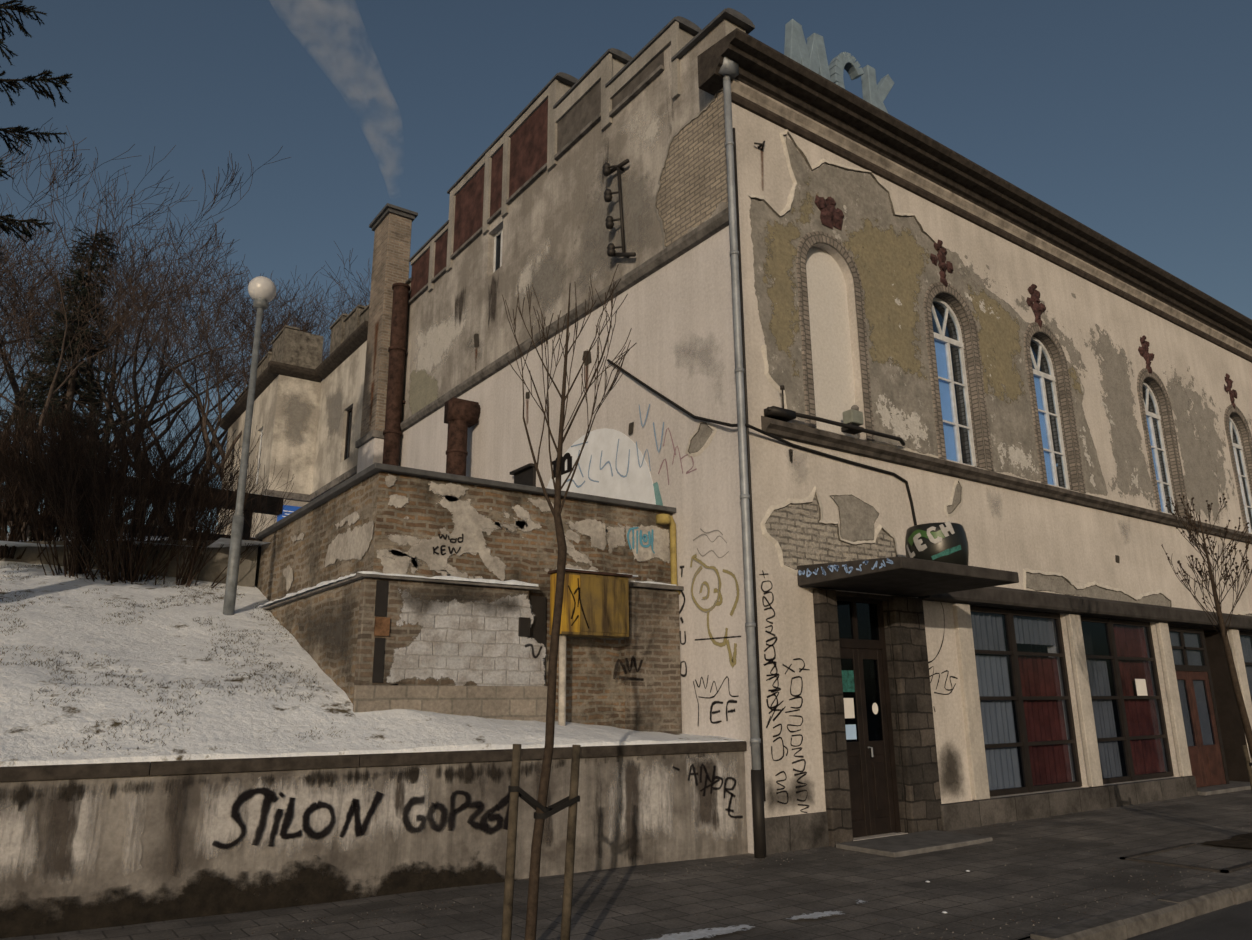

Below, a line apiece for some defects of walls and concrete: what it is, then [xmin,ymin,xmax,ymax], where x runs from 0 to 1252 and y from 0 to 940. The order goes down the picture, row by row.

flaking render [653,88,728,249]
leakage [579,157,649,282]
leakage [415,291,480,374]
peeling [748,129,1155,508]
peeling [325,481,554,686]
peeling [544,518,670,572]
flaking render [760,486,899,576]
flaking render [1023,568,1172,607]
leakage [0,794,96,880]
leakage [199,771,428,854]
leakage [596,762,672,862]
leakage [687,757,739,837]